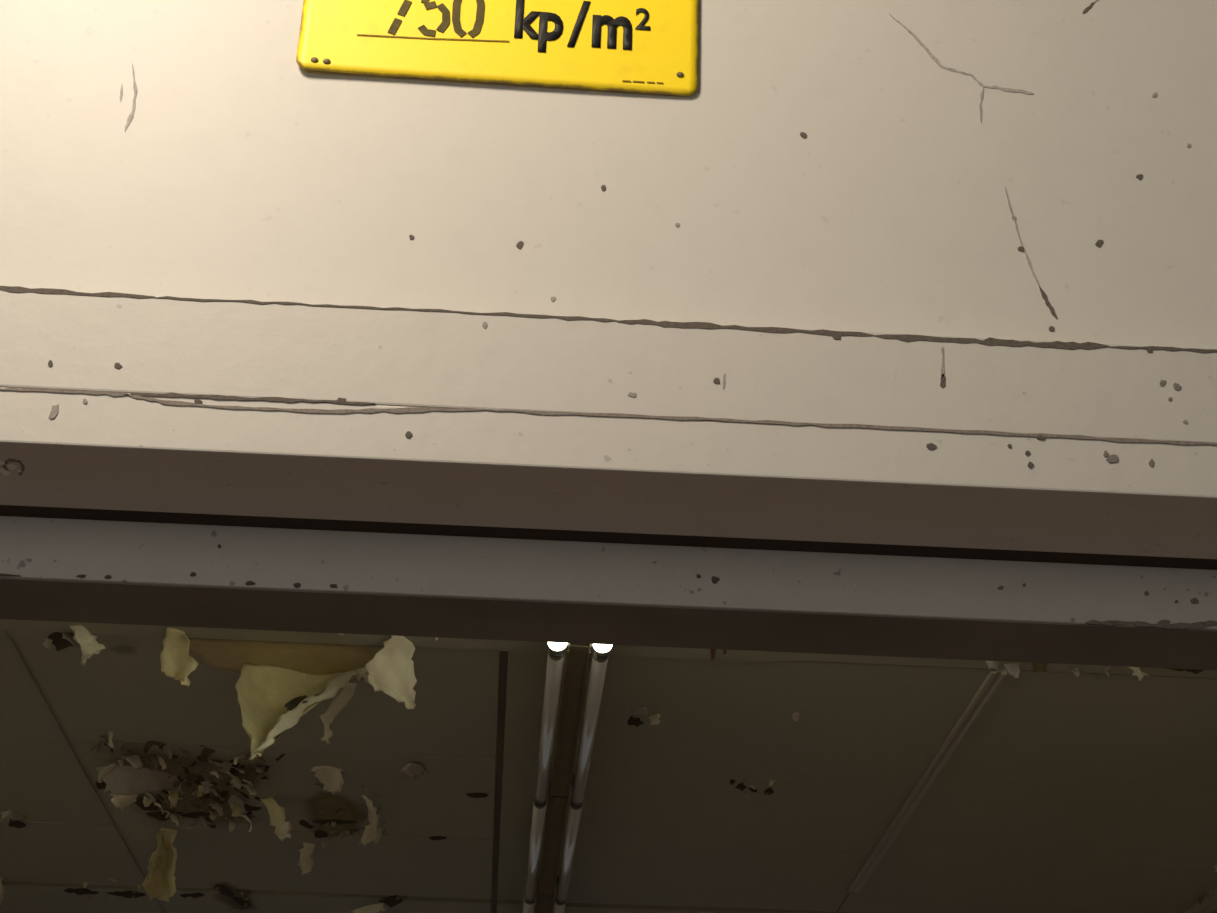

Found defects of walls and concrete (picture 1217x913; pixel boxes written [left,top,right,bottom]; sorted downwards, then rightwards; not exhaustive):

crack [890,15,1034,121]
peeling [43,625,106,666]
peeling [986,661,1046,678]
peeling [90,628,417,902]
peeling [209,884,251,912]
peeling [351,895,407,913]